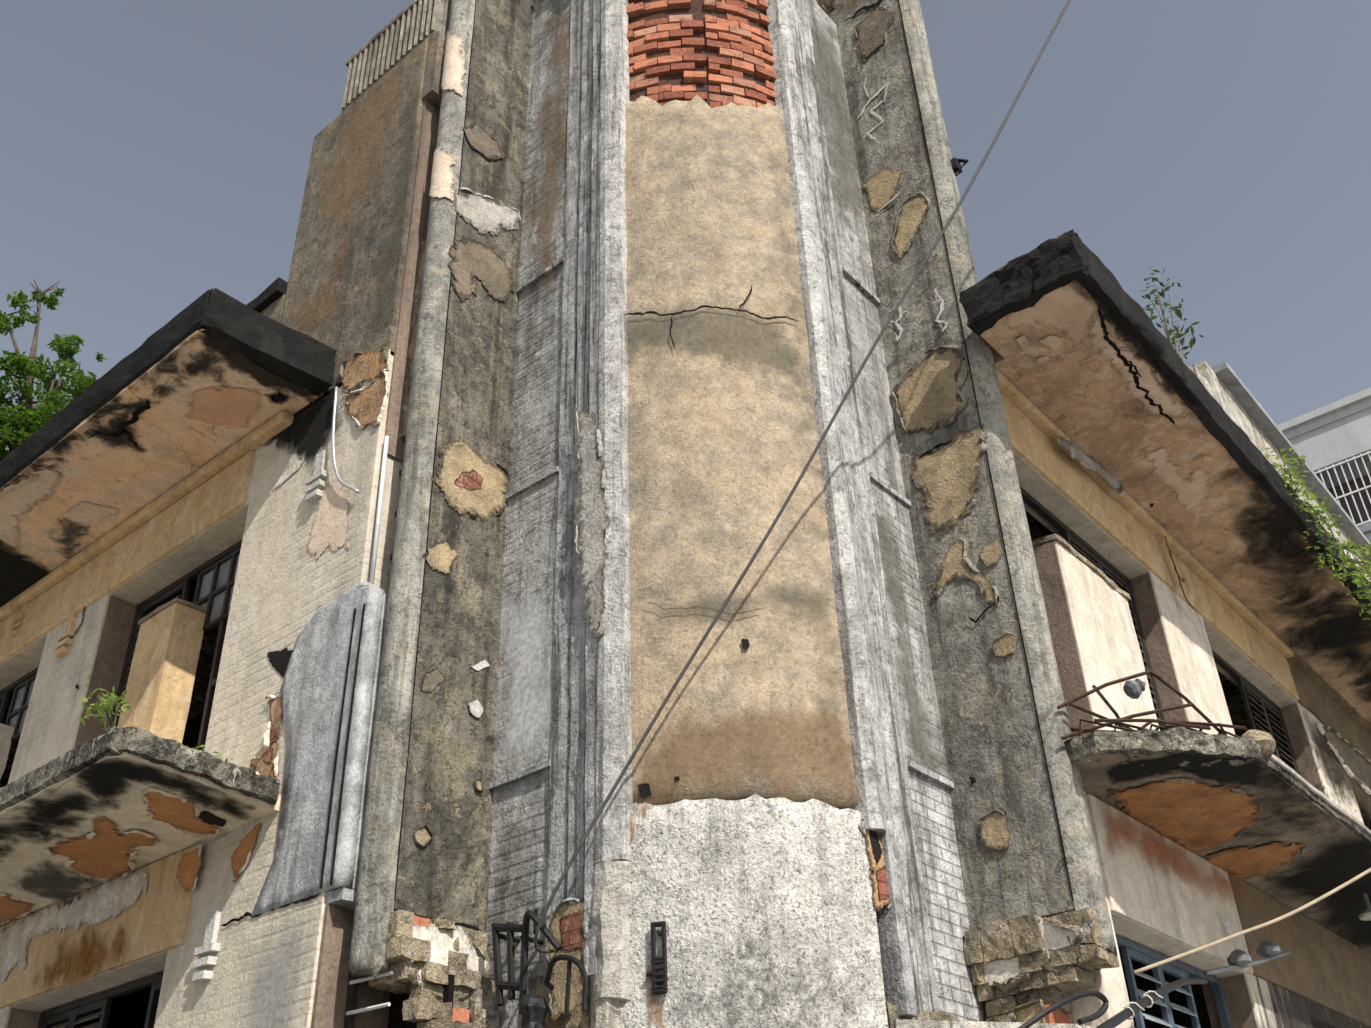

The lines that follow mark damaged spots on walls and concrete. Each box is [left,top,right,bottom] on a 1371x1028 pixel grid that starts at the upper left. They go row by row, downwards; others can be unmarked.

peeling [448,187,521,302]
crack [624,285,799,350]
water stain [0,321,340,491]
spalling [431,436,510,523]
spalling [888,288,1004,605]
crack [1098,307,1175,425]
water stain [0,541,50,607]
water stain [0,759,255,855]
water stain [1311,724,1371,814]
spalling [859,818,893,912]
water stain [1275,839,1371,947]
spalling [404,919,489,1001]